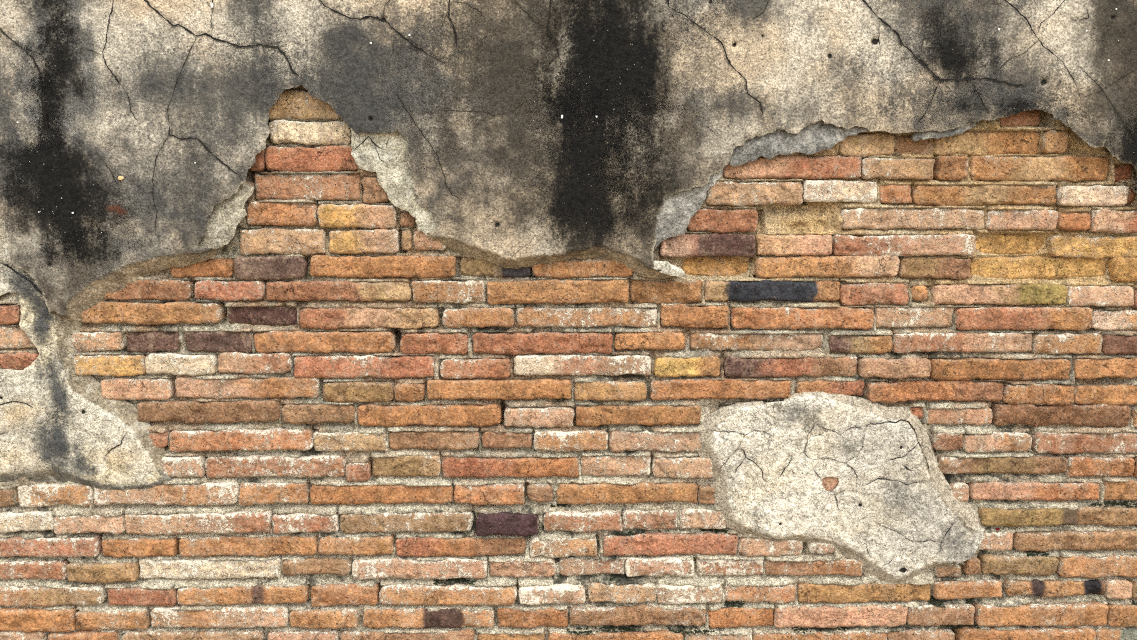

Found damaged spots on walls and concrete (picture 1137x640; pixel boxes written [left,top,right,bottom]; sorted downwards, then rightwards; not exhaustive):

water stain [0,0,129,264]
crack [144,0,300,227]
spalling [198,175,255,258]
water stain [119,0,443,251]
spalling [350,128,440,236]
crack [319,0,486,64]
water stain [445,0,678,251]
spalling [654,119,869,277]
crack [862,0,1137,141]
spalling [970,234,1137,282]
water stain [1073,0,1137,169]
crack [712,407,930,509]